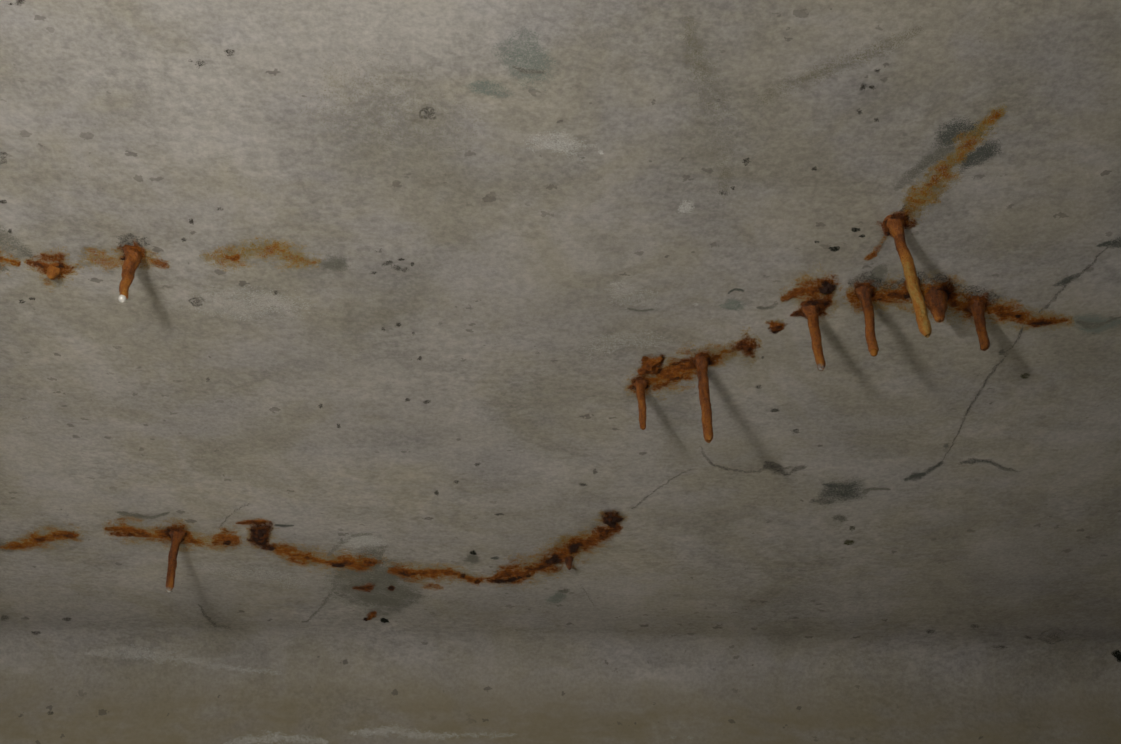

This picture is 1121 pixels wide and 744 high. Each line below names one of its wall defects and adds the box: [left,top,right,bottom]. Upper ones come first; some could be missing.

rust [0,226,170,292]
rust [199,233,350,272]
rust [622,105,1074,404]
crack [938,247,1108,465]
rust [0,521,87,553]
rust [102,510,629,593]